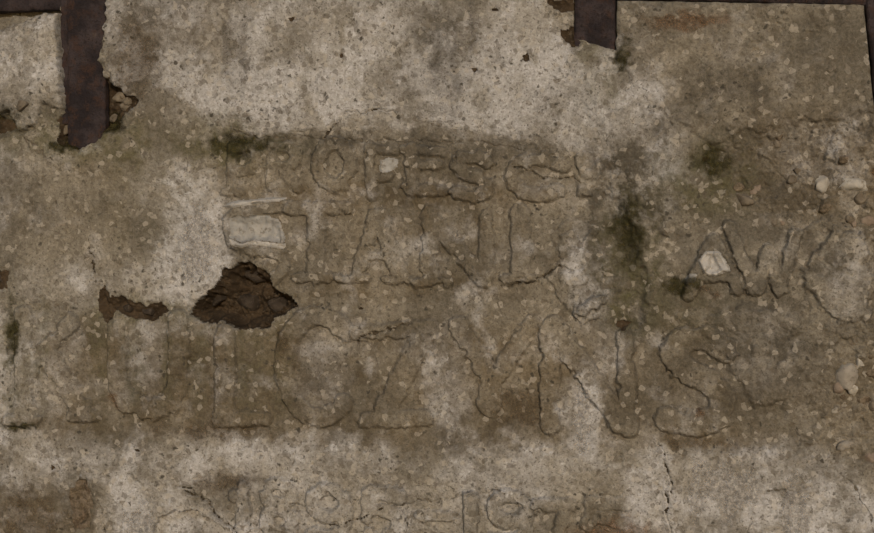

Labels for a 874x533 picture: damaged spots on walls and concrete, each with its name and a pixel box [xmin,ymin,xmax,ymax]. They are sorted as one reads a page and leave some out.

spalling [0,270,9,289]
crack [182,486,237,533]
crack [657,441,673,531]